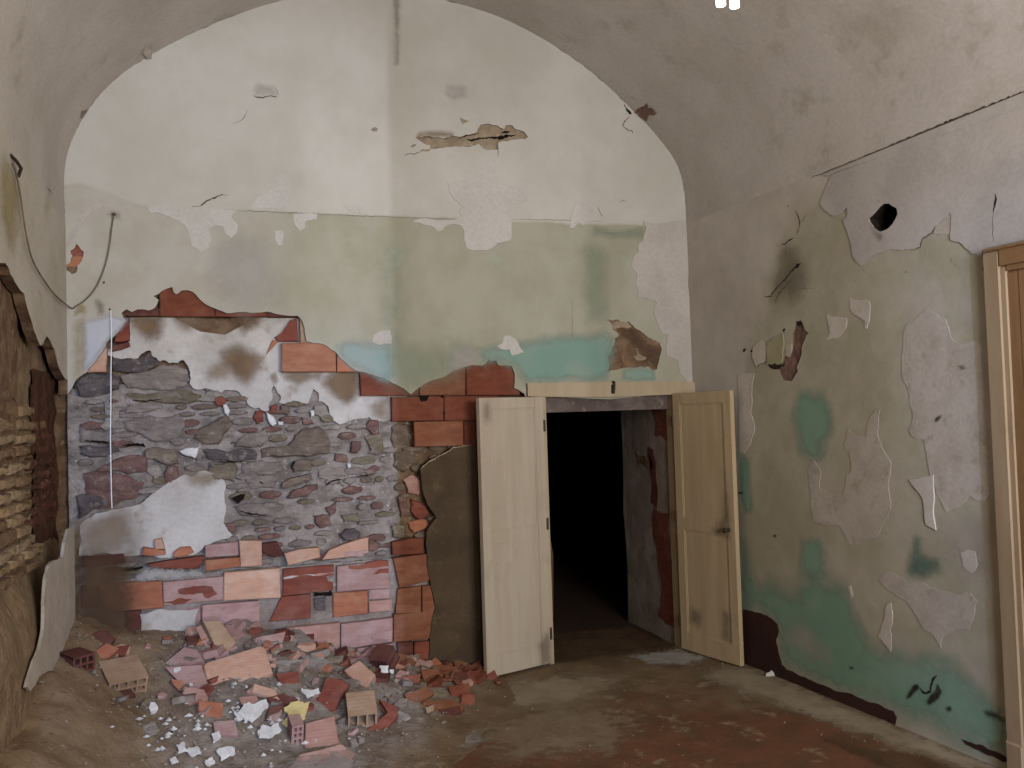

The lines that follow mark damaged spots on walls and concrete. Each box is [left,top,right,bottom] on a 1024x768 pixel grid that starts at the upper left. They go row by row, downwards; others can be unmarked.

flaking render [635,104,656,121]
crack [811,91,1024,178]
peeling [410,118,528,251]
peeling [819,107,1024,265]
flaking render [67,244,84,274]
peeling [607,220,693,382]
flaking render [743,321,809,381]
peeling [901,309,995,530]
flaking render [0,288,523,766]
peeling [878,572,978,651]
damp [907,675,951,711]